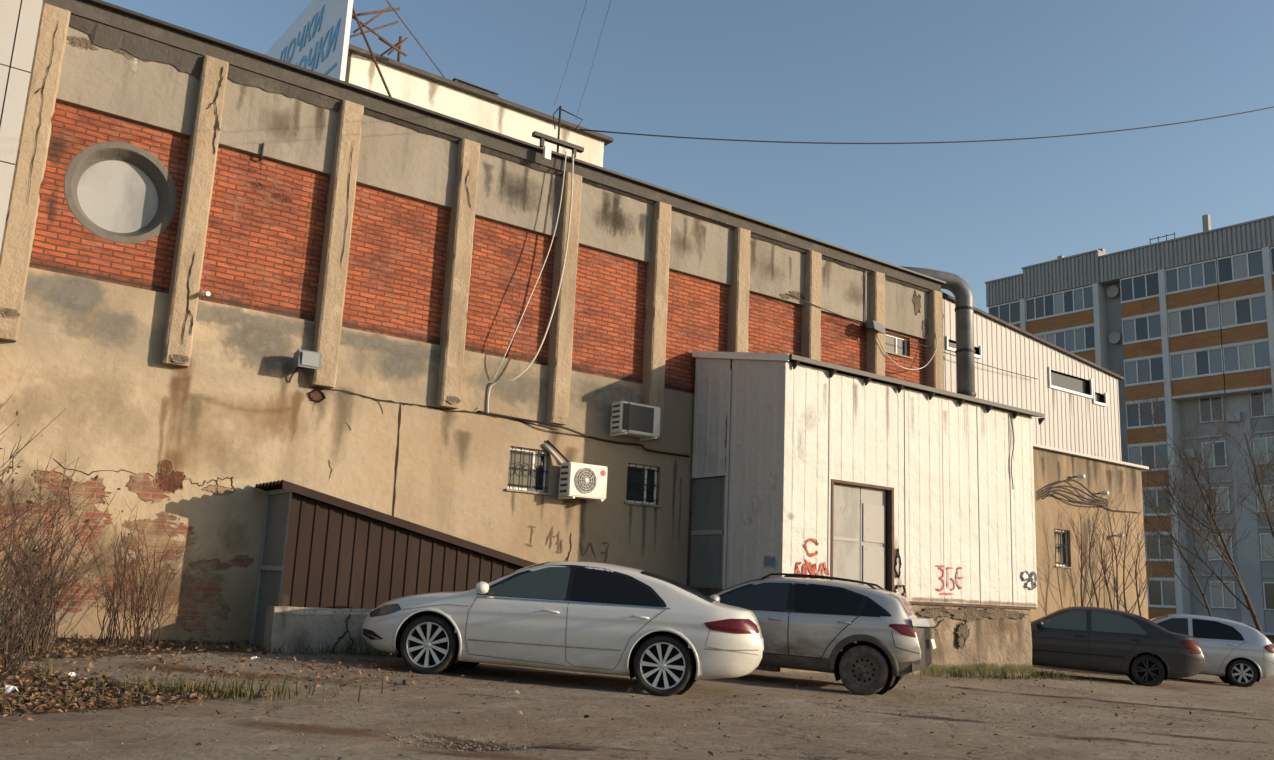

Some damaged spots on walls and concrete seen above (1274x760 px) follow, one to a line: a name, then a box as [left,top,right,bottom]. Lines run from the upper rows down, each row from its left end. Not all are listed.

crack [27,20,59,205]
crack [207,67,223,154]
crack [182,253,195,344]
spalling [0,459,253,637]